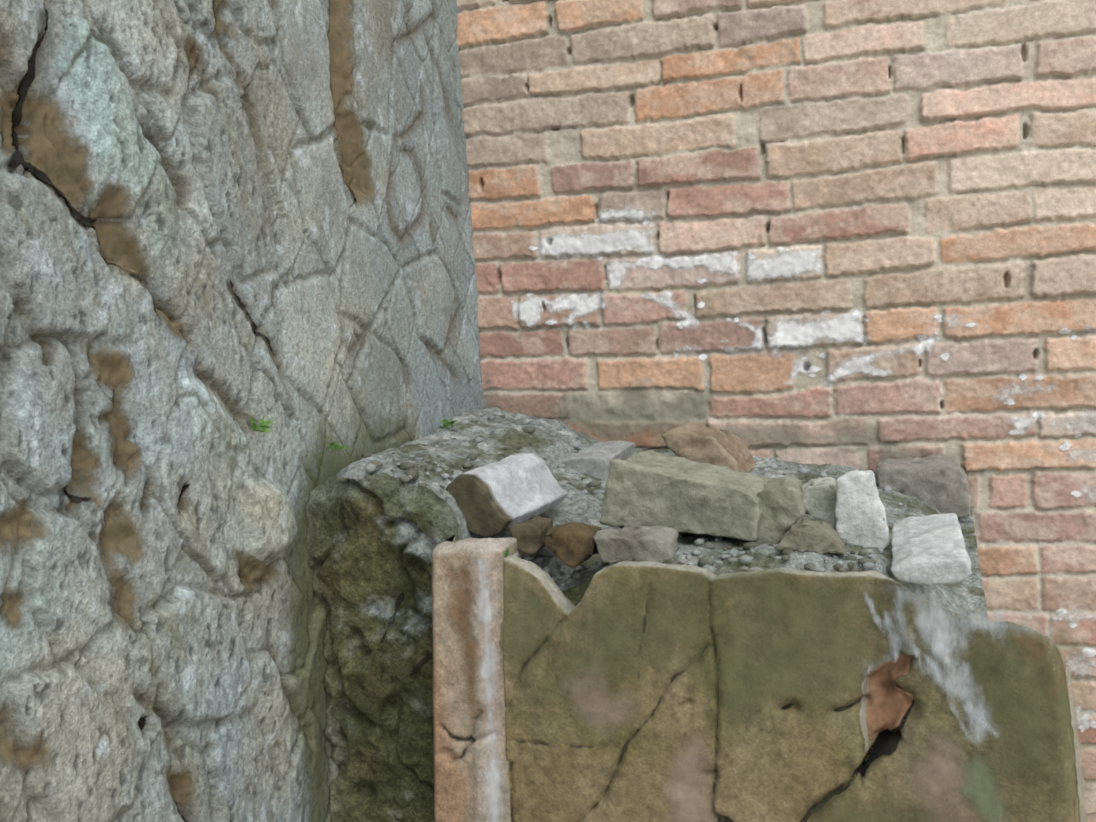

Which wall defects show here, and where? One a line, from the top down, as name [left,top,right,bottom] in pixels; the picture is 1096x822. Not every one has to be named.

crack [8,9,141,281]
damp [510,206,822,330]
damp [672,346,709,361]
damp [721,309,977,386]
crack [521,624,558,672]
crack [510,741,593,819]
crack [592,671,684,809]
crack [801,685,914,822]
spalling [861,652,914,740]
damp [868,590,910,661]
damp [913,593,998,737]